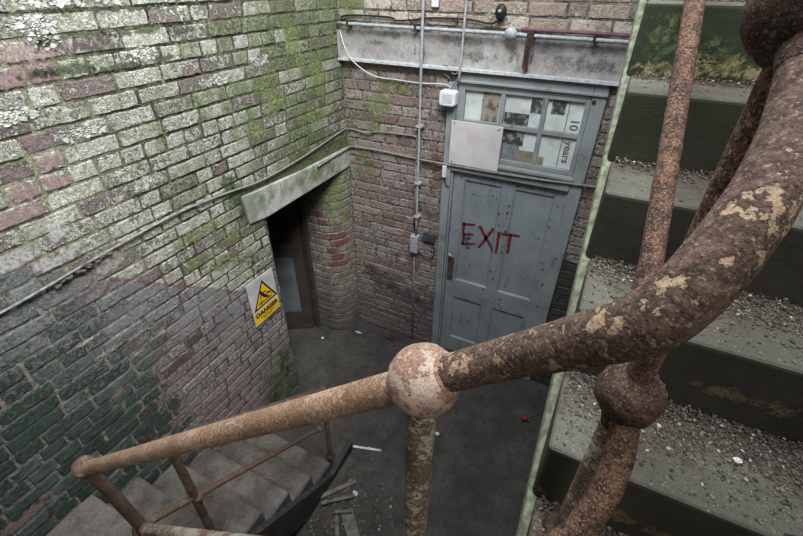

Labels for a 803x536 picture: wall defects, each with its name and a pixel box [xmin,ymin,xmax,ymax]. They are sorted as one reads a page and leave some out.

leakage [221,173,244,218]